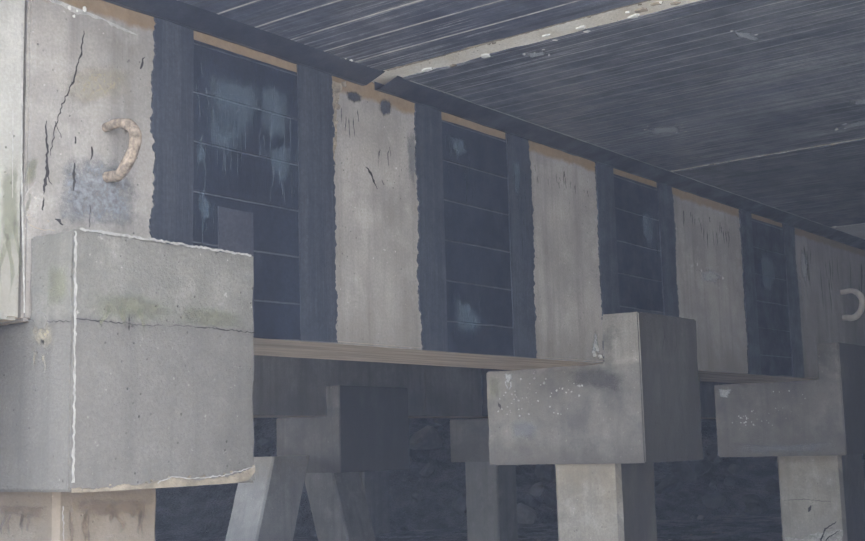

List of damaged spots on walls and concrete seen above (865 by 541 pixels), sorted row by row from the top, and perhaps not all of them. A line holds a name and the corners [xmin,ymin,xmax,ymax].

crack [42,33,93,225]
water stain [341,92,361,136]
water stain [381,100,391,115]
water stain [195,78,297,246]
peeling [785,529,843,541]
crack [820,522,840,541]